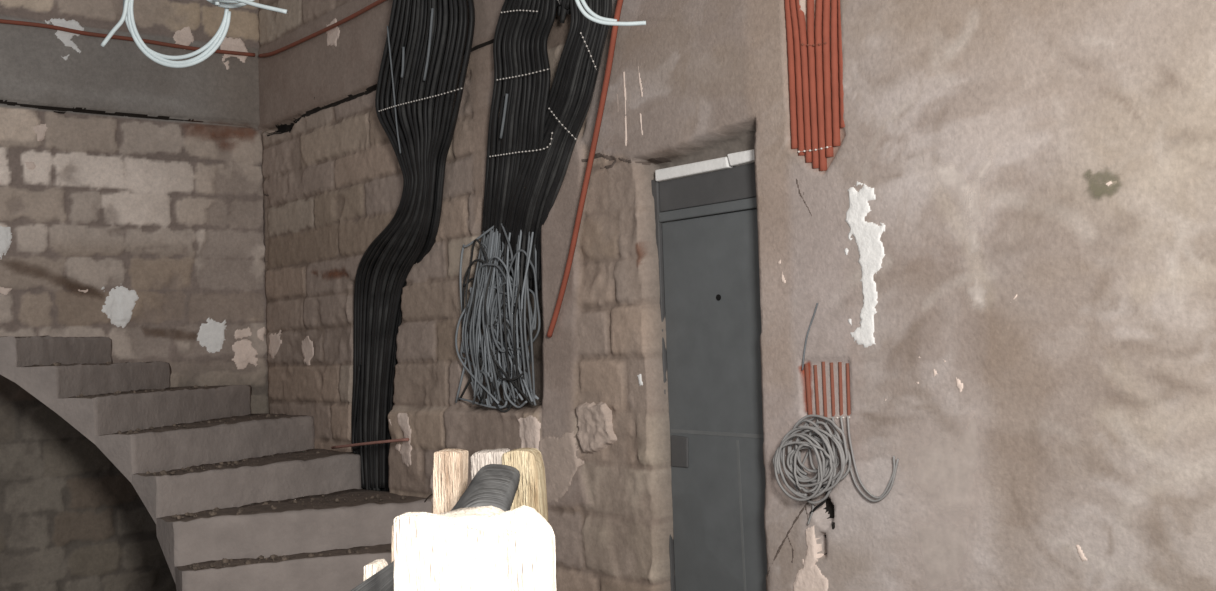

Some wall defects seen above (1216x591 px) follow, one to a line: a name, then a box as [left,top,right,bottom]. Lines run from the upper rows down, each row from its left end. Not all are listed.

crack [302,84,377,118]
leakage [1086,171,1119,197]
flaking render [844,181,885,348]
spalling [823,497,835,538]
flaking render [793,553,828,591]